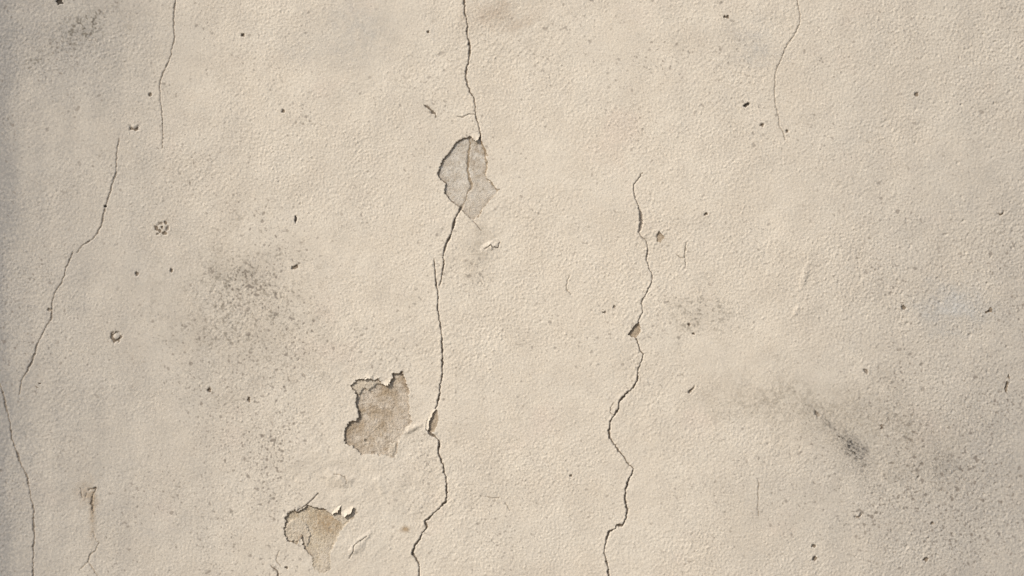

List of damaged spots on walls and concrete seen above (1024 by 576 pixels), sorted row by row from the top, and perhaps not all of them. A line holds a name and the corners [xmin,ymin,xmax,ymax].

crack [159,0,176,148]
crack [774,1,801,140]
peeling [437,132,500,220]
crack [0,138,120,576]
peeling [344,371,413,458]
crack [411,0,500,576]
crack [604,173,653,576]
peeling [283,505,358,573]